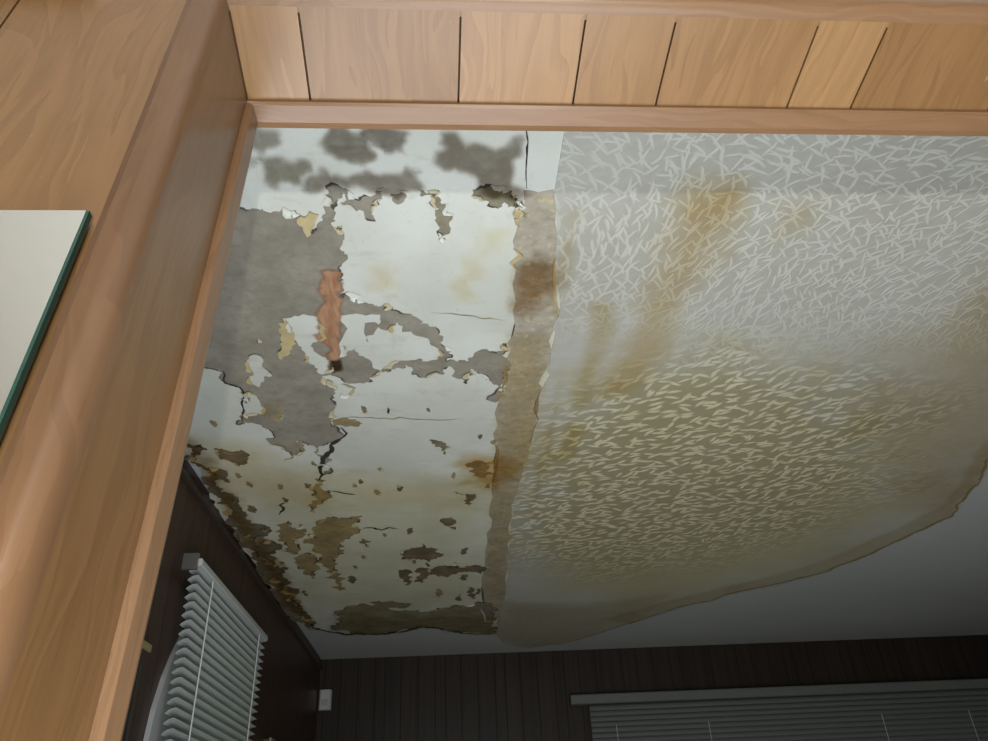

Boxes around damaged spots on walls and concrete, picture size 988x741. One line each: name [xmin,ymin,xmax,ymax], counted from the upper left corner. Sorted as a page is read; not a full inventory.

peeling [184,183,559,635]
crack [318,408,455,495]